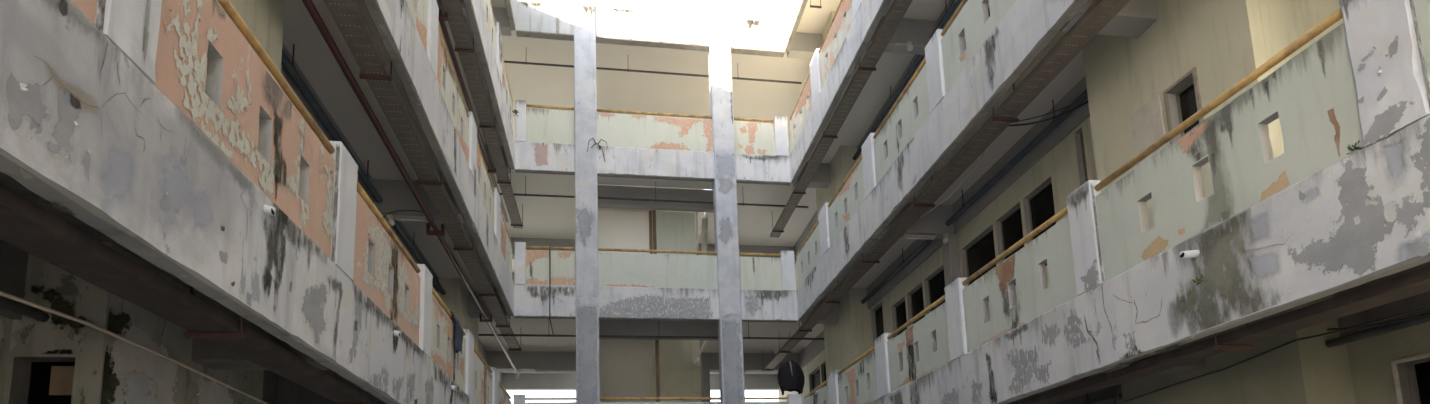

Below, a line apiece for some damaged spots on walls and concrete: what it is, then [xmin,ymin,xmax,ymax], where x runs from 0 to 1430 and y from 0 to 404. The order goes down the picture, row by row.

spalling [58,0,68,16]
flaking render [6,72,94,181]
peeling [163,0,329,227]
peeling [600,113,713,152]
flaking render [1356,36,1413,144]
flaking render [1288,118,1430,275]
damp [267,272,292,311]
damp [528,264,574,303]
damp [759,291,787,305]
flaking render [979,310,1090,394]
flaking render [1080,259,1099,294]
crack [1085,283,1162,363]